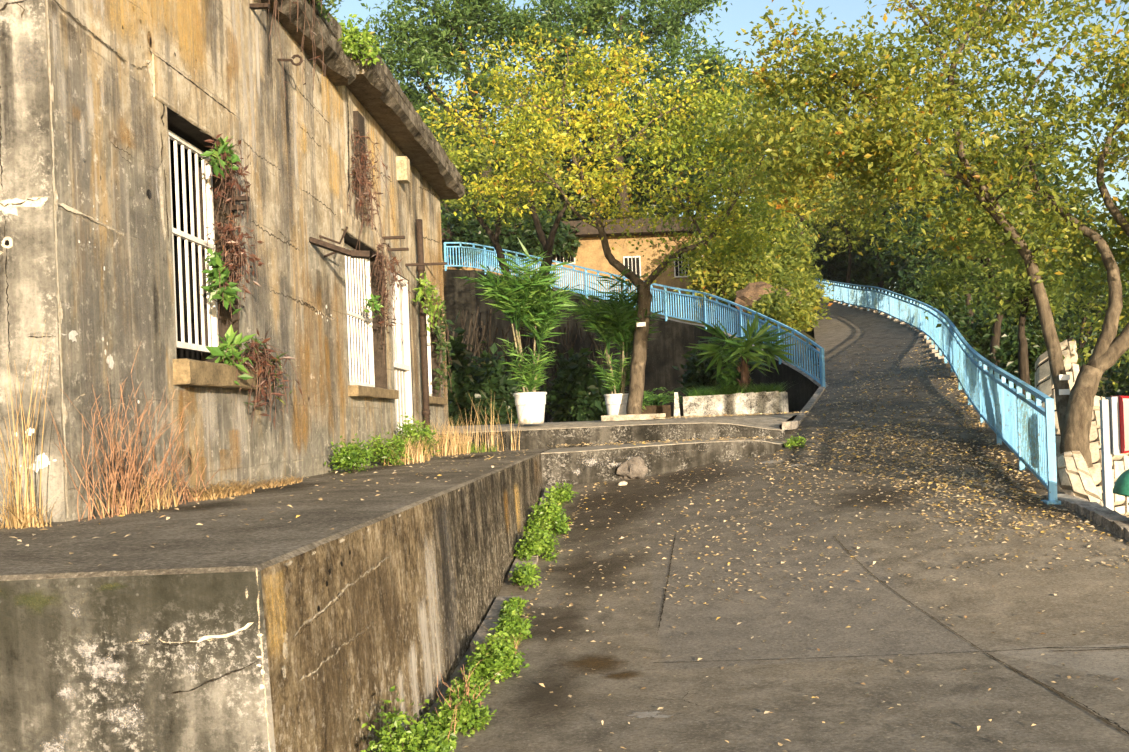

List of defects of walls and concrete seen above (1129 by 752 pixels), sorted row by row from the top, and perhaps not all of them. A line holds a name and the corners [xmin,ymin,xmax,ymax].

crack [0,0,26,17]
water stain [81,78,114,154]
crack [54,0,280,170]
water stain [241,9,298,334]
crack [0,86,122,354]
water stain [566,470,720,530]
crack [135,622,254,646]
crack [171,662,255,694]
crack [292,559,385,679]
water stain [380,463,537,710]
water stain [562,561,619,583]
water stain [562,656,636,679]